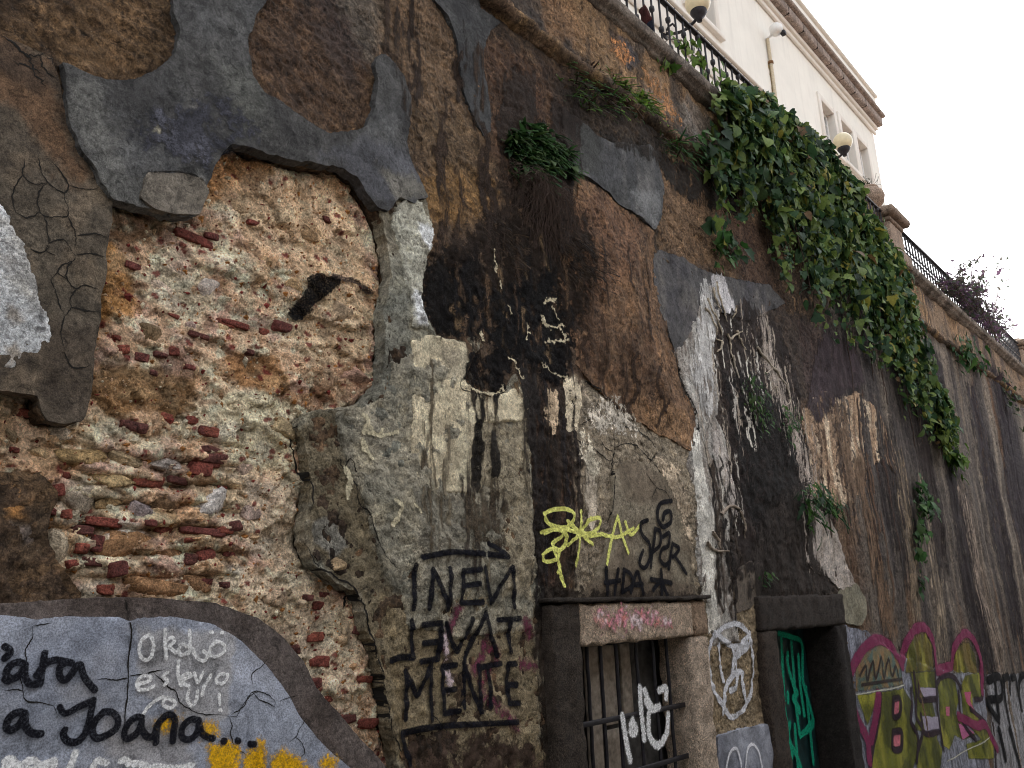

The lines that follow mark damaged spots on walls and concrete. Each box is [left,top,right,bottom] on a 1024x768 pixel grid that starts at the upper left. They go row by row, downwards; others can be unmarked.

crack [2,36,56,85]
damp [383,0,424,122]
crack [11,151,105,369]
spalling [0,0,428,768]
damp [390,21,1024,768]
crack [4,623,58,718]
crack [96,600,307,756]